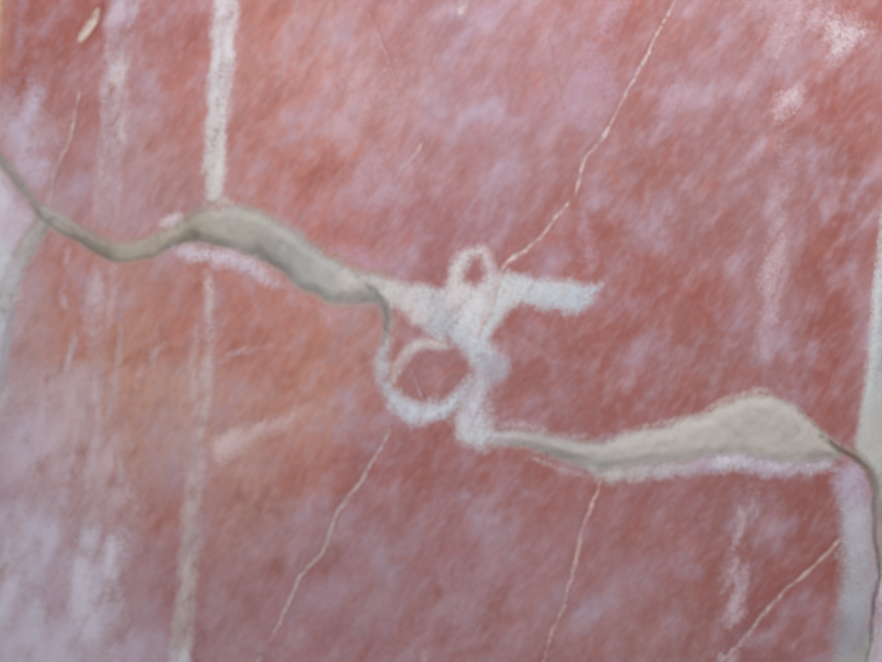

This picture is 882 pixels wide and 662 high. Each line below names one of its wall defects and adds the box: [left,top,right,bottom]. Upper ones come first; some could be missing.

crack [0,92,396,363]
crack [475,0,676,338]
crack [270,430,391,636]
crack [488,386,882,662]